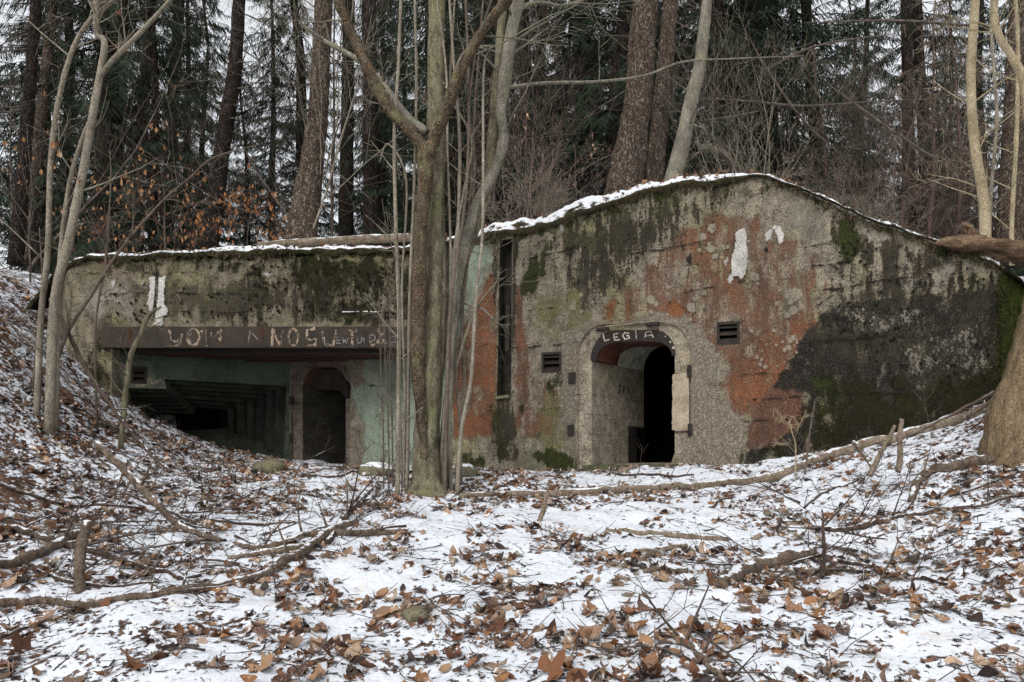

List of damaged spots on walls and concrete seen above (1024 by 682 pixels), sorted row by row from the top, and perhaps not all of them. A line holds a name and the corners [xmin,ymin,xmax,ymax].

leakage [142,276,168,326]
spalling [515,196,747,466]